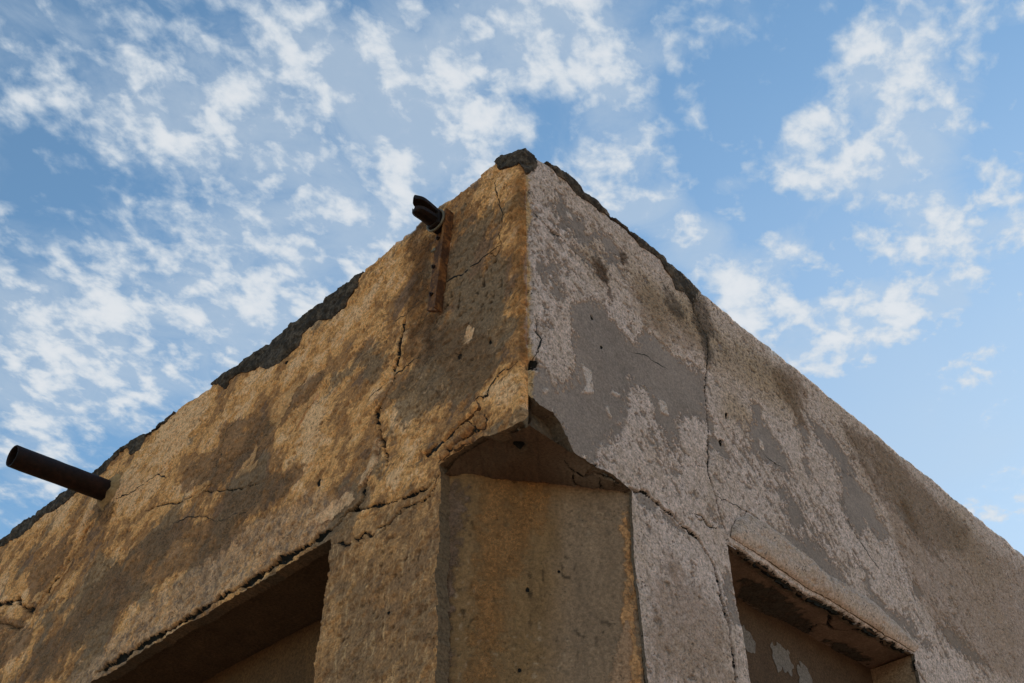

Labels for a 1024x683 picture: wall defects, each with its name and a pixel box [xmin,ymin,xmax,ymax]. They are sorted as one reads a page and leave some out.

crack [447,182,503,282]
crack [475,316,542,400]
peeling [513,261,731,467]
crack [564,304,923,679]
peeling [777,498,851,586]
flaking render [723,565,870,665]
peeling [864,567,933,649]